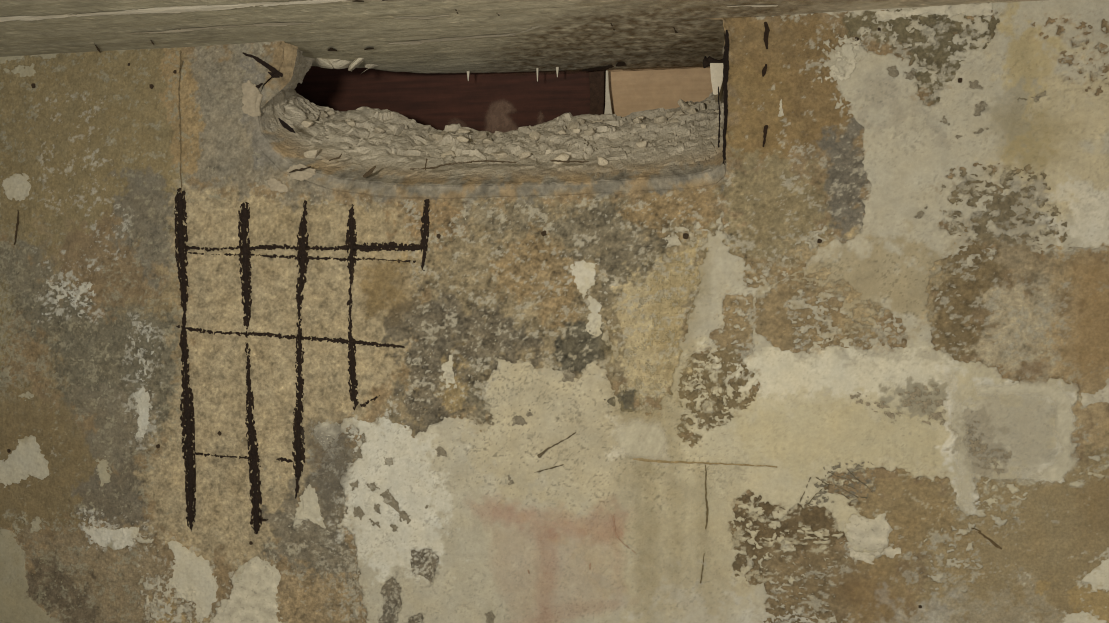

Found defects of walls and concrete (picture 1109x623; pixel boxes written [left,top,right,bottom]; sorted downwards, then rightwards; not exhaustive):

spalling [703,56,723,68]
peeling [974,101,987,116]
flaking render [267,178,289,193]
flaking render [287,161,316,181]
peeling [677,293,760,431]
peeling [728,163,1109,623]
peeling [512,409,533,426]
peeling [677,414,702,448]
peeling [366,482,411,532]
peeling [411,548,439,584]
peeling [378,577,402,623]
peeling [408,614,423,623]